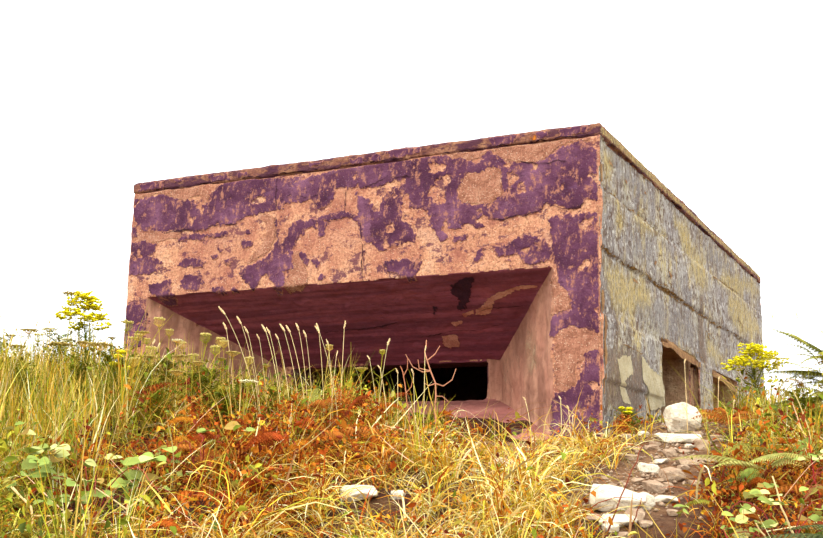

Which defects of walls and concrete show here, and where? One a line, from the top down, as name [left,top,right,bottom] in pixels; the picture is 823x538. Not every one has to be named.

peeling [129,125,613,439]
damp [450,277,474,311]
peeling [124,302,151,349]
spalling [618,355,665,411]